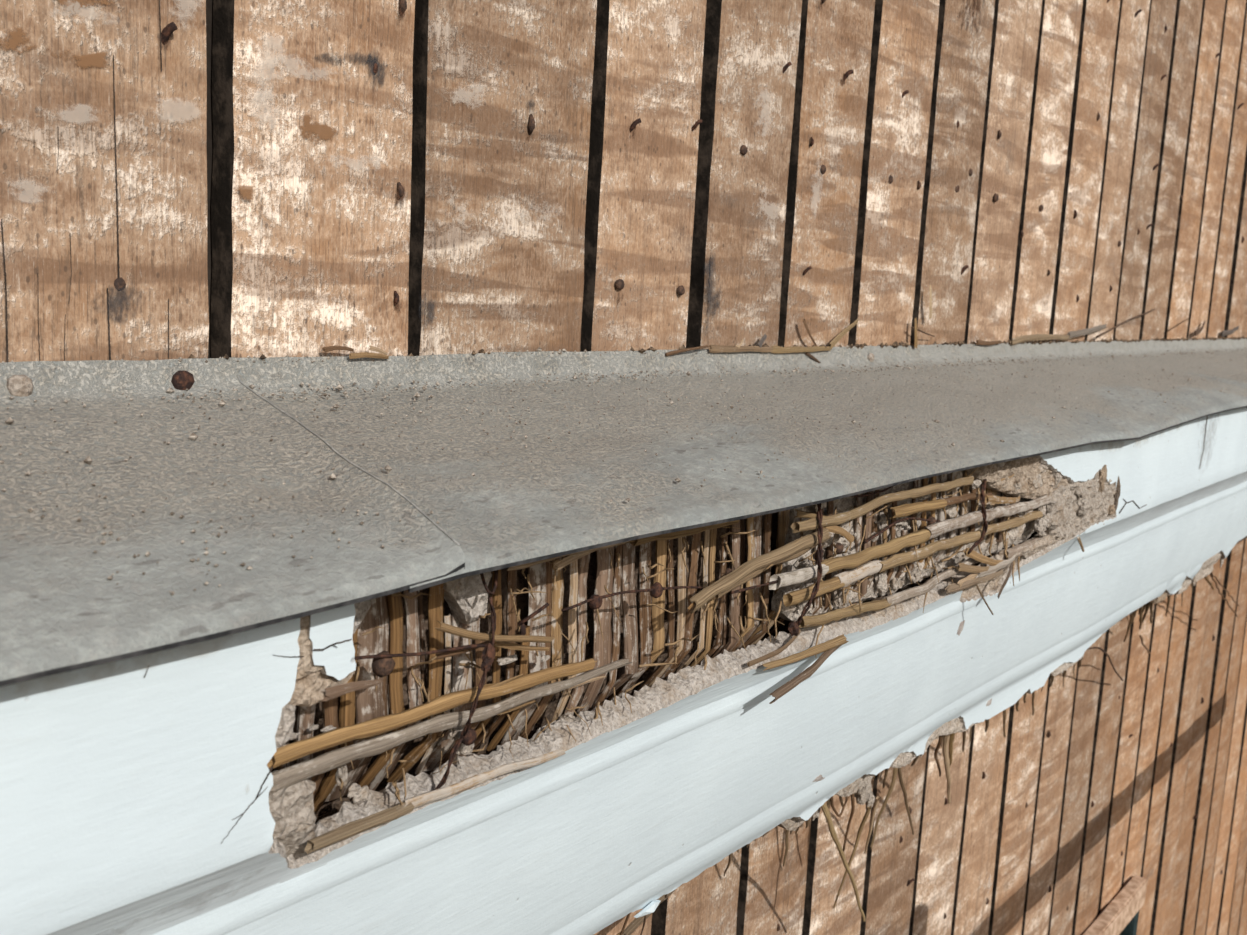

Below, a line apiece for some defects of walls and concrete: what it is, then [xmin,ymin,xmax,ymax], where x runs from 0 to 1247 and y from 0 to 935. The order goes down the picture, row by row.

flaking render [771,456,1121,624]
flaking render [443,571,492,625]
spalling [1150,552,1224,604]
flaking render [275,599,372,749]
flaking render [497,655,518,665]
flaking render [448,726,474,768]
spalling [890,718,975,768]
flaking render [335,764,370,805]
spalling [836,775,875,810]
flaking render [269,779,317,857]
spalling [777,807,821,831]
flaking render [634,900,661,918]